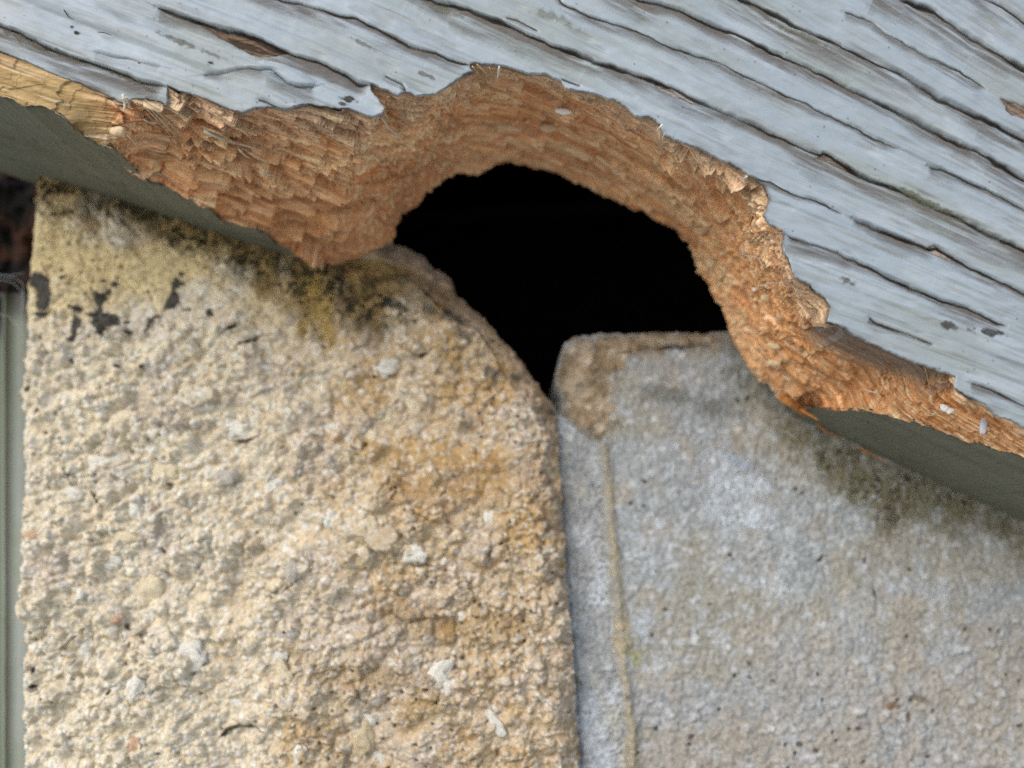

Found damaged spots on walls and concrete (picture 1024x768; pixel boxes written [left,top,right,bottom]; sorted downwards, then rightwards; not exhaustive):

crack [420,0,1024,261]
peeling [1000,99,1024,118]
spalling [27,272,191,342]
crack [660,343,683,351]
crack [789,237,1004,326]
crack [868,319,931,344]
crack [856,223,1024,297]
spalling [556,332,723,440]
crack [972,384,1023,406]